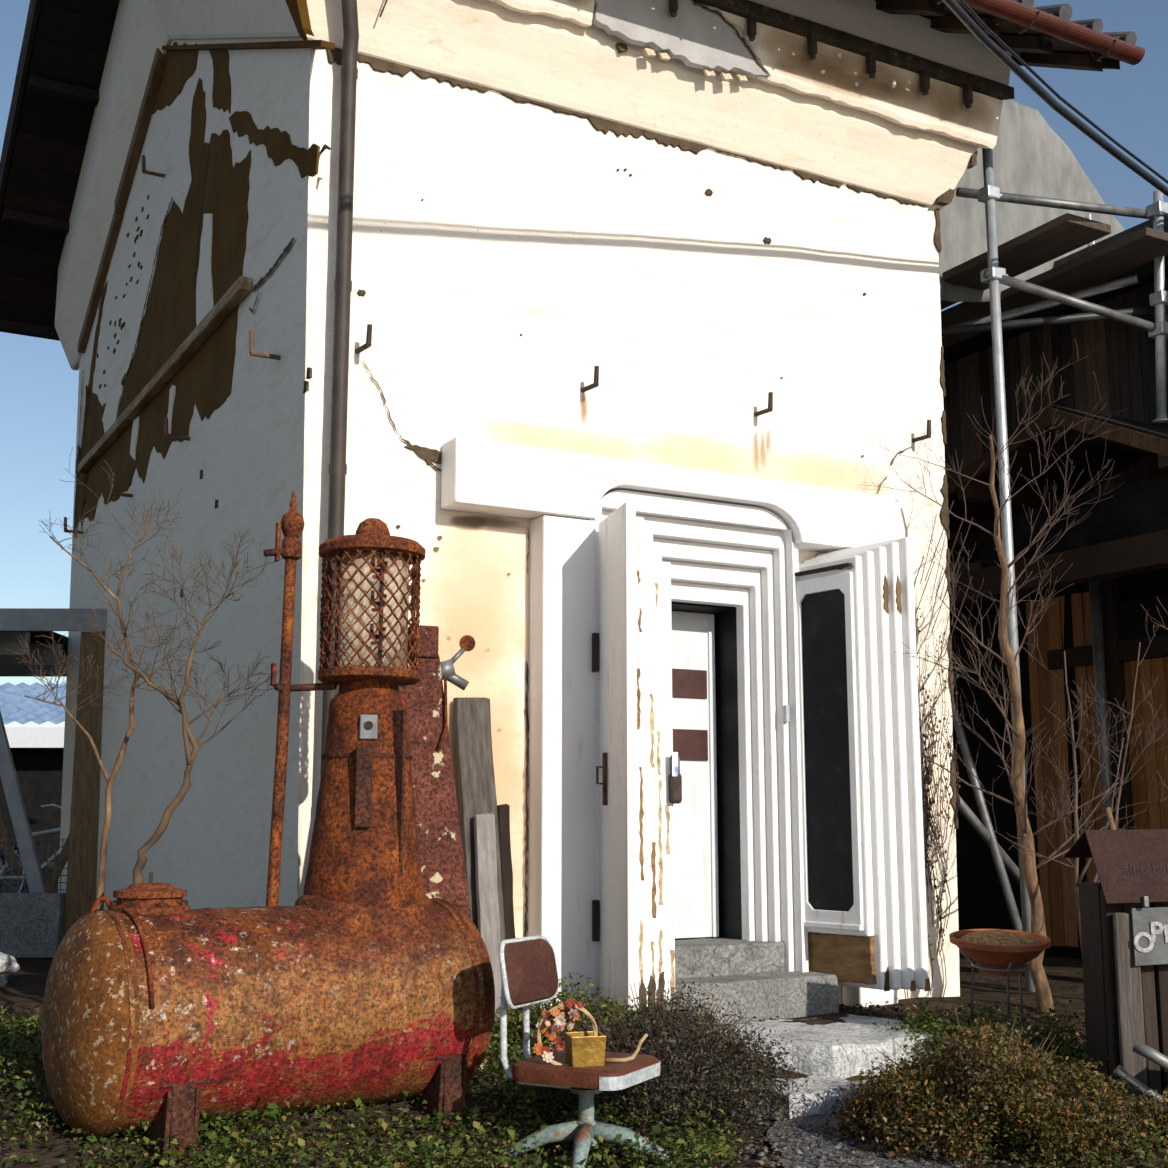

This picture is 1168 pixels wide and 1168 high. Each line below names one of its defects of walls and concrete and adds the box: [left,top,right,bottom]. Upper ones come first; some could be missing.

peeling [326,47,343,66]
spalling [592,0,770,82]
peeling [357,53,956,252]
spalling [967,151,978,169]
peeling [74,42,331,537]
crack [361,359,441,471]
rust [755,432,770,469]
spalling [940,474,951,596]
spalling [947,633,955,711]
spalling [950,749,958,829]
peeling [637,668,675,1007]